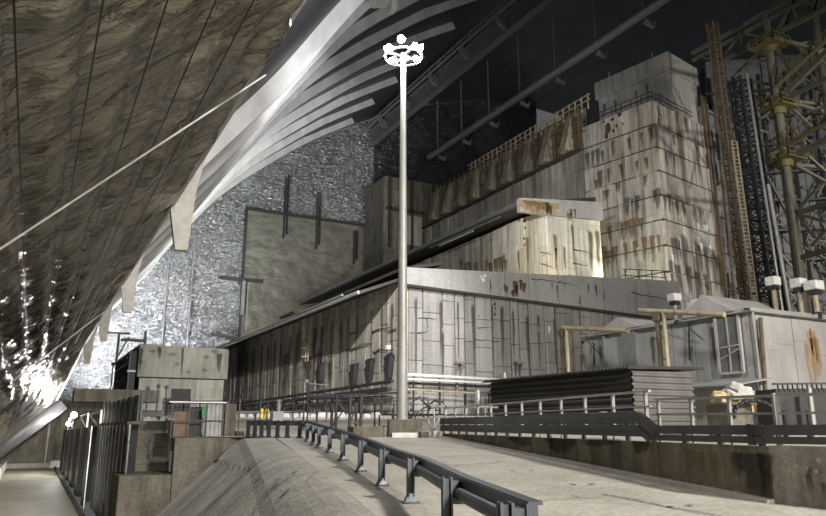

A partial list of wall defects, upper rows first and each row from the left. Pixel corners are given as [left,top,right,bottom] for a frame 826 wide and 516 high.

leakage [585,141,623,197]
rust [520,200,558,215]
leakage [588,232,600,264]
rust [601,218,661,267]
leakage [663,194,723,294]
rust [504,280,526,297]
rust [805,329,822,373]